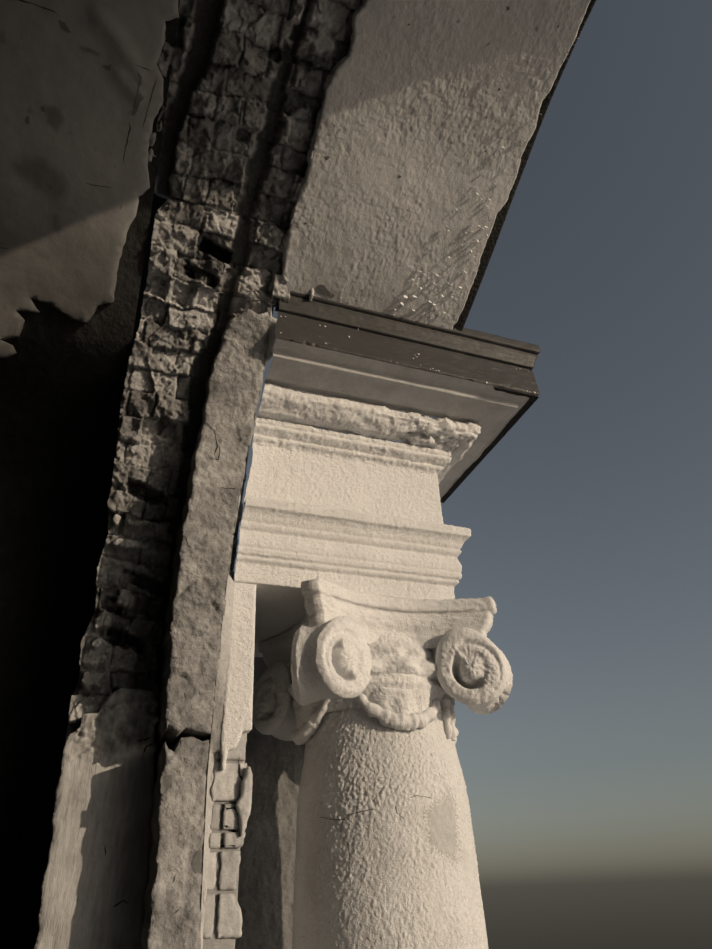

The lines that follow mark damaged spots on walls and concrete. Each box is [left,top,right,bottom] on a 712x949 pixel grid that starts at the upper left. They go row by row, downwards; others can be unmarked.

flaking render [65,0,368,743]
flaking render [154,724,178,795]
flaking render [192,407,258,949]
crack [316,795,430,866]